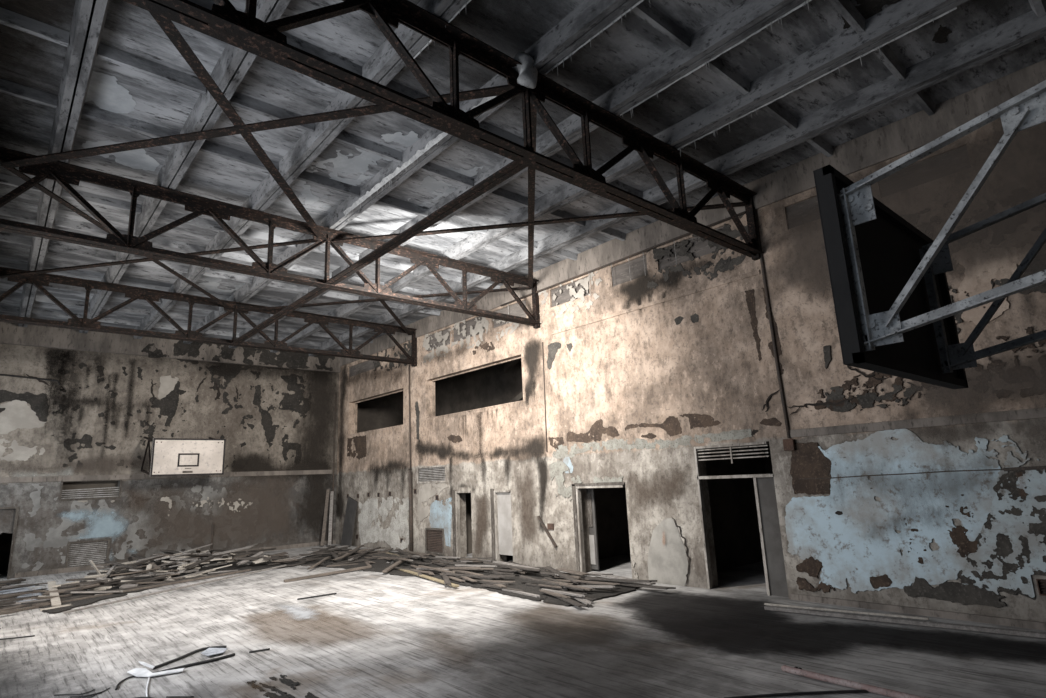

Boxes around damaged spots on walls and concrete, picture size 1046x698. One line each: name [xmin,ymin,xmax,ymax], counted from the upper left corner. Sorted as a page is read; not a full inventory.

flaking render [646,214,748,289]
peeling [948,253,1046,333]
peeling [0,362,310,468]
damp [45,340,400,549]
flaking render [823,345,832,369]
flaking render [804,372,925,412]
peeling [974,326,1046,371]
crack [674,519,690,586]
peeling [785,429,1046,608]